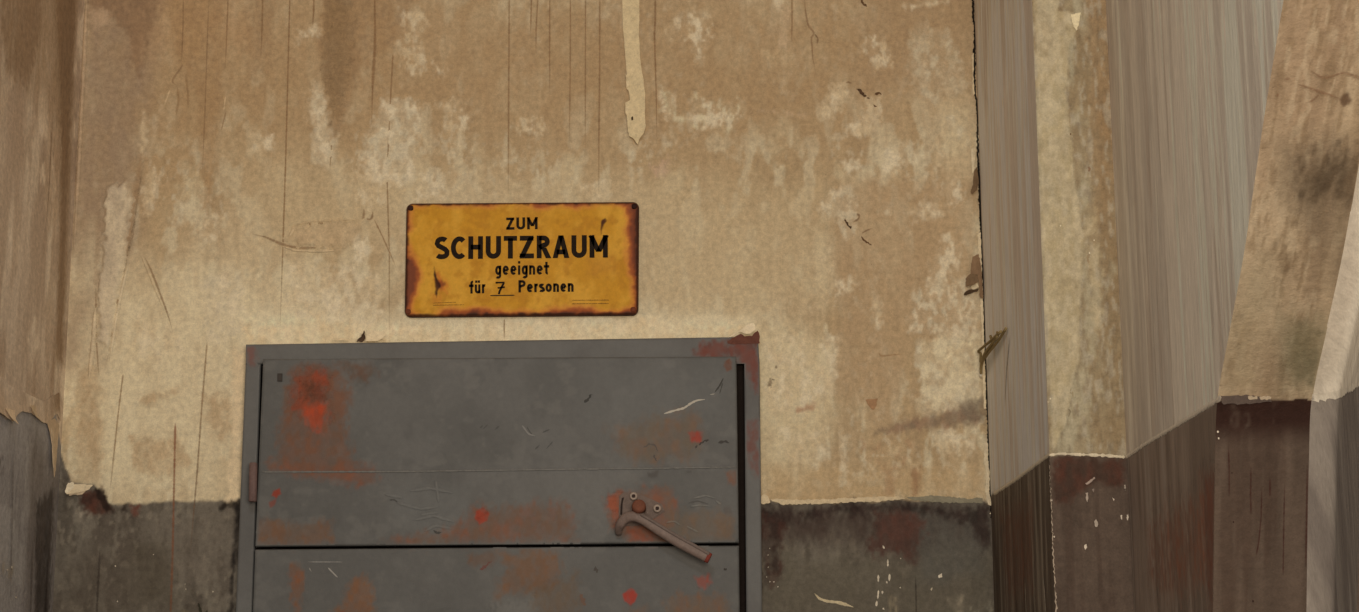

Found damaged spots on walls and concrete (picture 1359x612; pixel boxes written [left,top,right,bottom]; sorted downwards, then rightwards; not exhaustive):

peeling [293,20,324,51]
peeling [393,5,432,78]
peeling [622,0,748,144]
peeling [305,78,473,215]
peeling [576,177,614,202]
peeling [0,377,93,496]
damp [0,0,291,612]
peeling [222,235,844,502]
peeling [761,0,1283,612]
peeling [1313,381,1359,402]